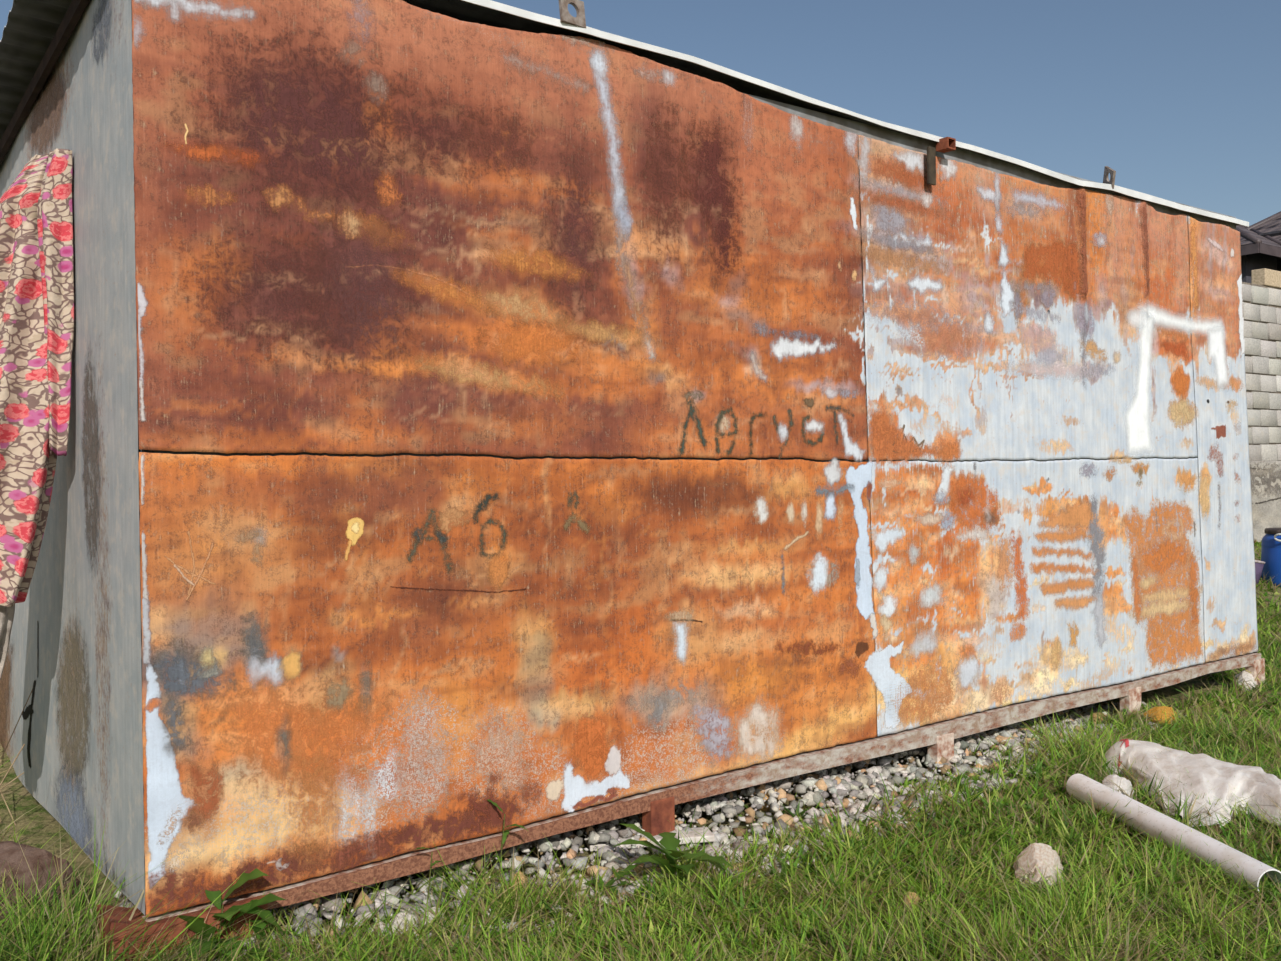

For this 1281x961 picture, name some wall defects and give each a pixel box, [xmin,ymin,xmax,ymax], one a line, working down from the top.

peeling [138,283,148,421]
rust [177,37,648,394]
rust [646,107,740,273]
peeling [893,151,924,176]
peeling [977,173,1014,332]
peeling [1237,273,1245,357]
peeling [917,465,988,541]
rust [57,623,123,889]
peeling [142,533,195,888]
rust [149,650,542,913]
rust [572,715,618,809]
rust [777,641,869,678]